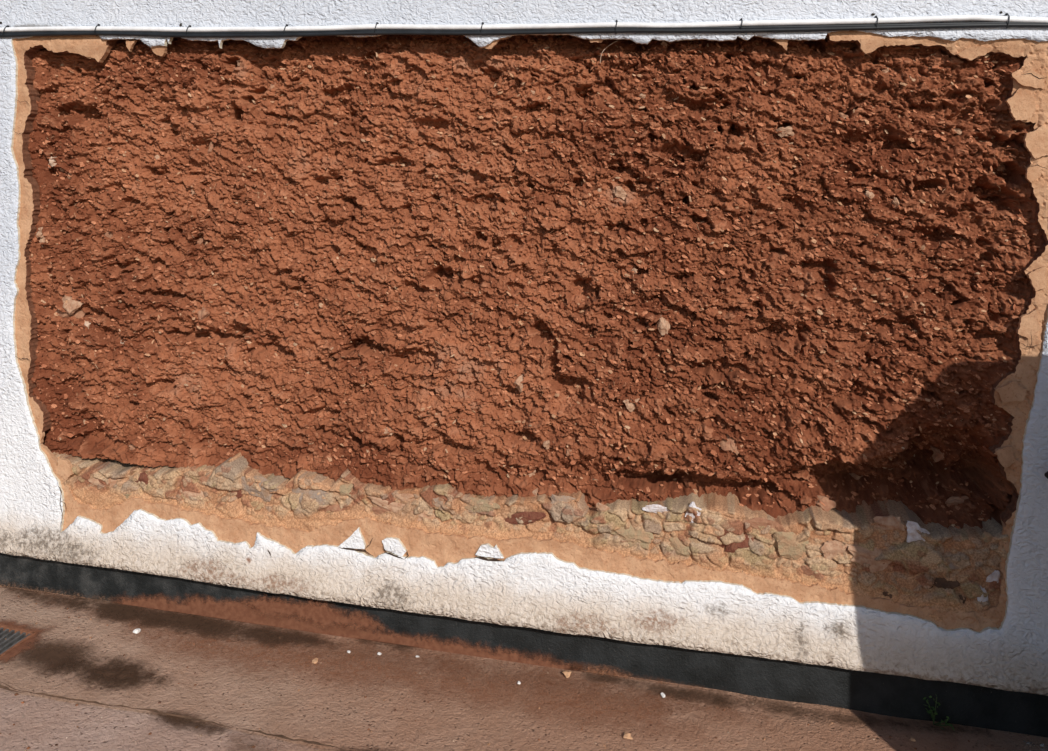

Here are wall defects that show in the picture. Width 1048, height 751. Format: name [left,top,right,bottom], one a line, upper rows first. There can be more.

spalling [13,31,1048,632]